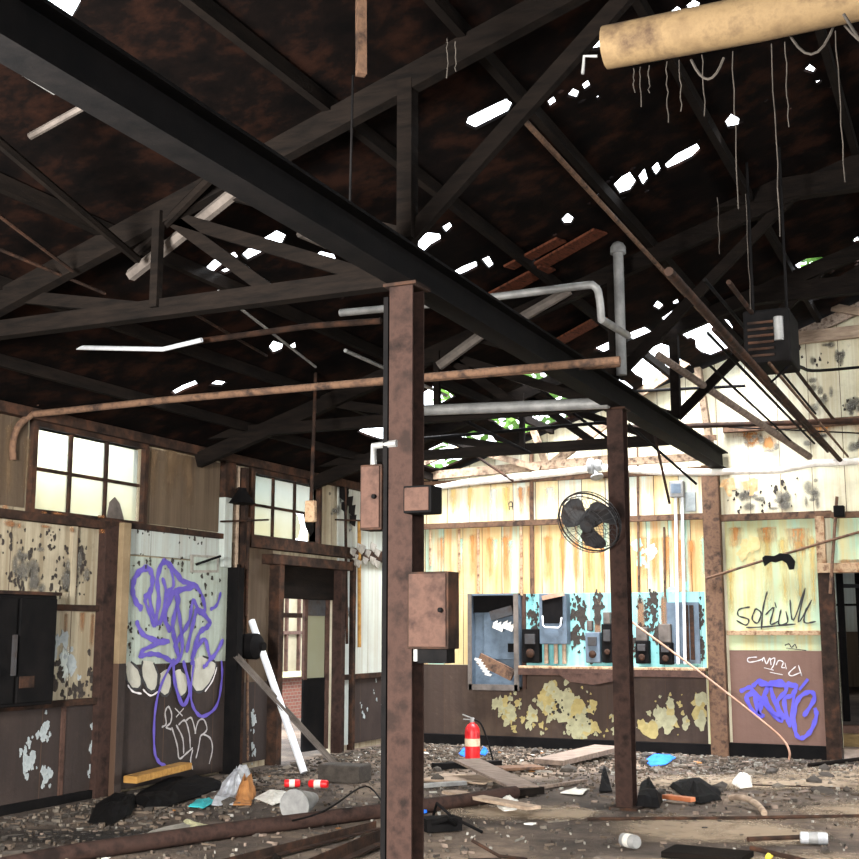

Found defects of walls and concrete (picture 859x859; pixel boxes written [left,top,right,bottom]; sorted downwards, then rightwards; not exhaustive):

damp [823,342,845,364]
damp [846,398,859,415]
damp [732,489,790,510]
damp [805,479,819,506]
peeling [0,528,92,599]
corrosion [487,537,508,571]
corrosion [560,538,604,577]
corrosion [780,528,815,600]
peeling [570,589,605,653]
peeling [53,630,93,700]
peeling [492,679,614,739]
peeling [19,710,53,789]